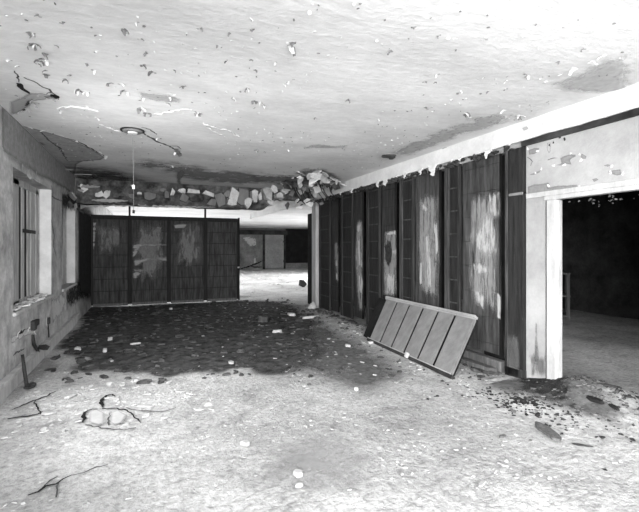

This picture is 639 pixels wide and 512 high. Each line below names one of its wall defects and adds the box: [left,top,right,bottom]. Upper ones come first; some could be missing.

crack [14,71,59,100]
crack [141,127,181,167]
peeling [2,83,515,213]
peeling [552,153,586,167]
peeling [528,183,580,193]
crack [8,391,56,419]
crack [81,394,176,430]
crack [28,464,108,497]